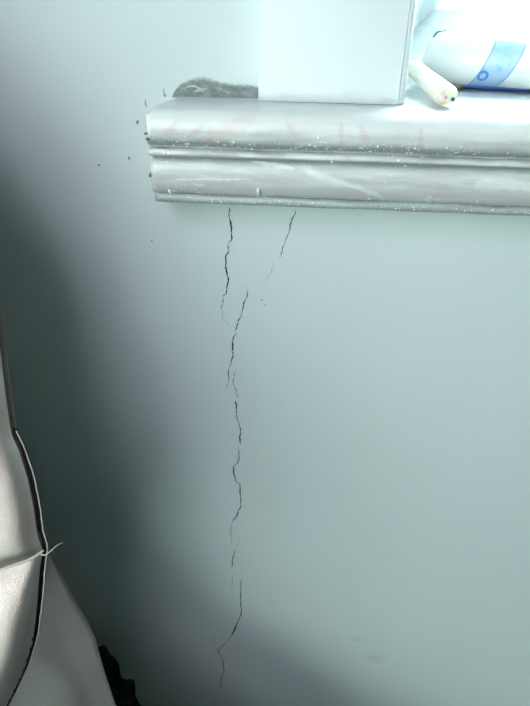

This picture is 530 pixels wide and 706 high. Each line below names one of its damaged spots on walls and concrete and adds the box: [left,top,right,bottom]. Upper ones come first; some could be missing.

crack [218,208,248,688]